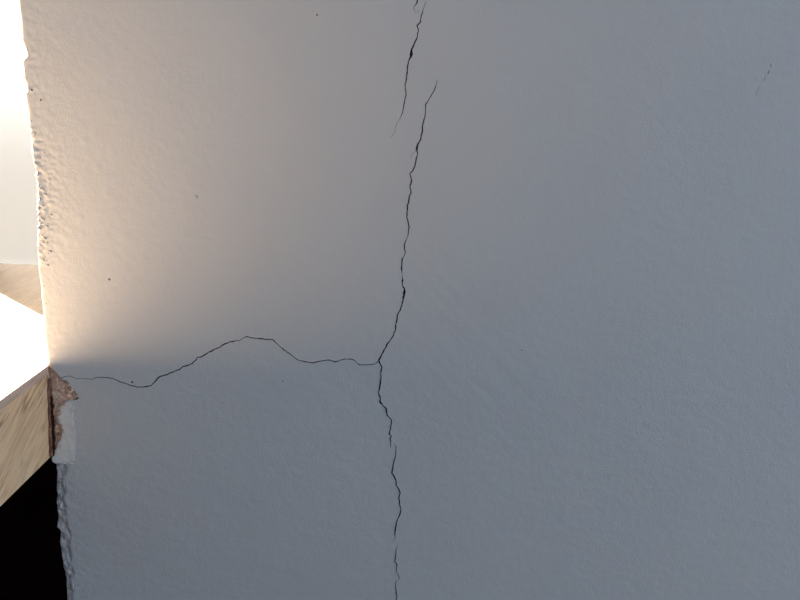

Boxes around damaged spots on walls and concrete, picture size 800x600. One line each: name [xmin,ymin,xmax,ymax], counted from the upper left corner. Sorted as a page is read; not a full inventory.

spalling [48,363,79,600]
crack [61,0,438,600]